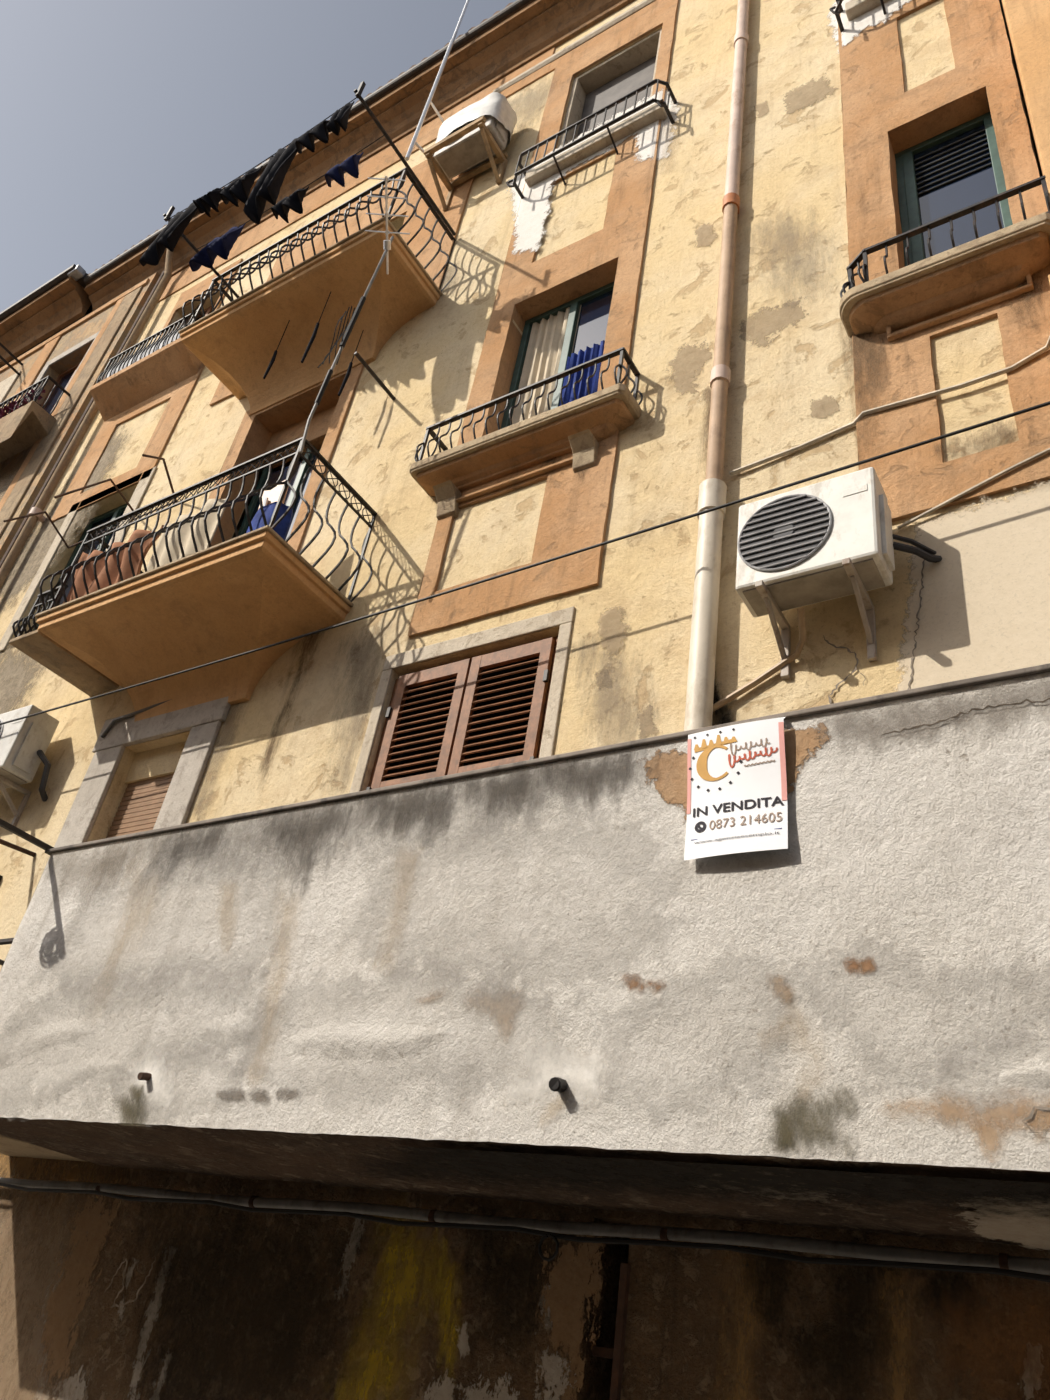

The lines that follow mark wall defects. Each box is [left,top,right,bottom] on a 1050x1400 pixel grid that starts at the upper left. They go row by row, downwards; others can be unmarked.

peeling [753,73,838,117]
peeling [739,297,808,348]
crack [907,560,925,690]
crack [823,635,866,704]
crack [882,698,1050,735]
damp [488,769,528,809]
damp [546,754,629,797]
spalling [637,706,687,820]
spalling [784,722,831,794]
damp [773,1090,851,1148]
damp [368,1146,1050,1217]
peeling [418,1234,608,1400]